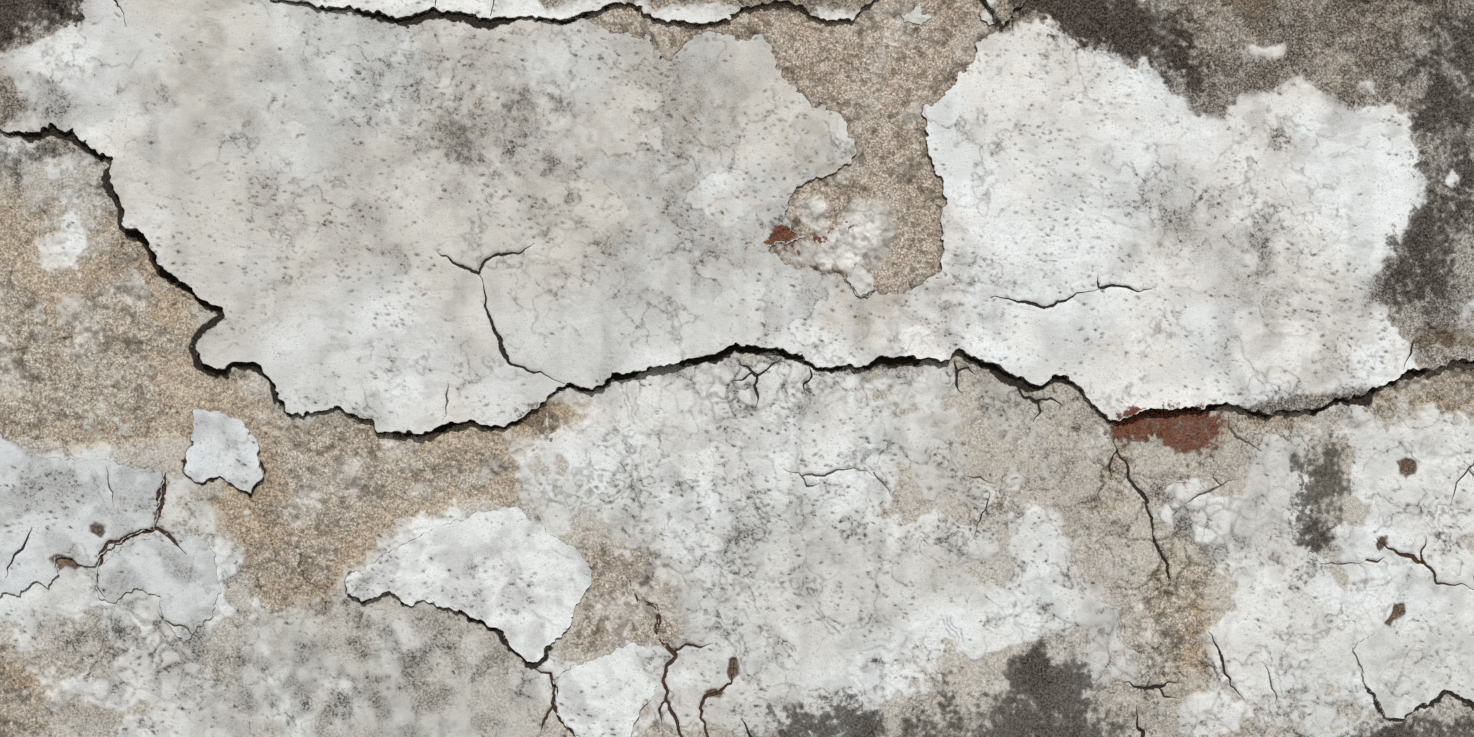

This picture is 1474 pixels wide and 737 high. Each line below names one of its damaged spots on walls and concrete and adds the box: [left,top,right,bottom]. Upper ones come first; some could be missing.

crack [270,0,751,30]
water stain [1008,0,1216,98]
flaking render [0,0,1474,439]
rust [764,221,854,256]
water stain [1383,0,1474,312]
crack [0,124,1474,599]
spalling [0,248,221,642]
flaking render [183,409,264,494]
spalling [246,419,508,613]
rust [1103,402,1225,484]
crack [628,577,752,737]
water stain [732,637,1143,737]